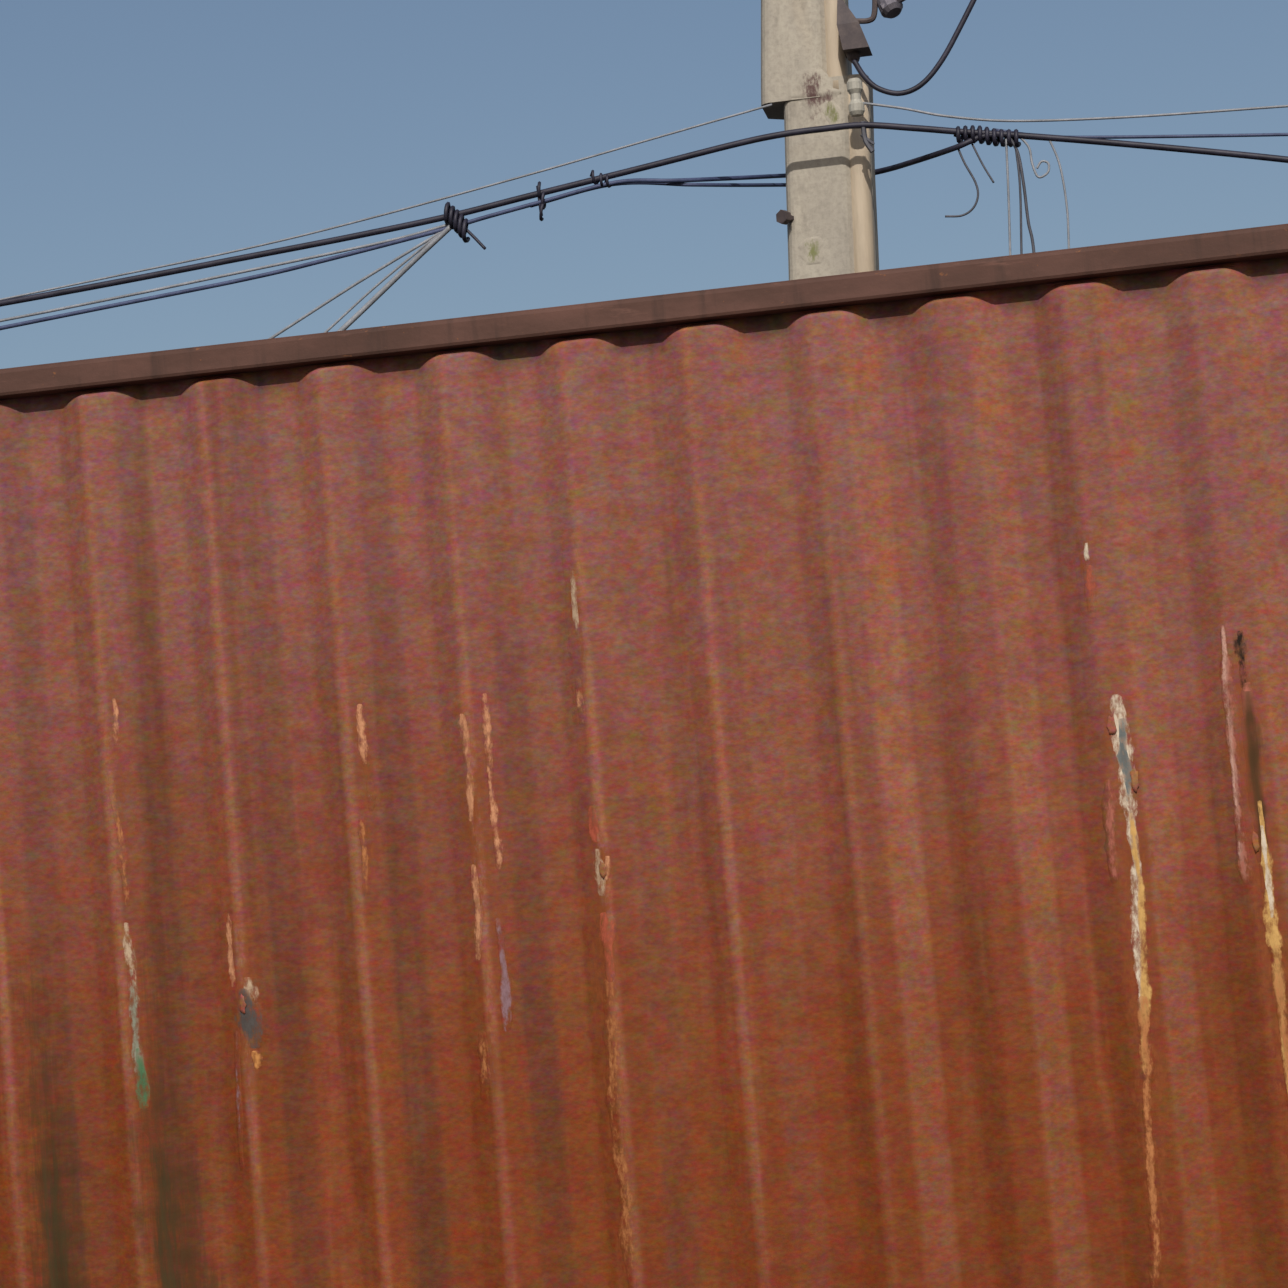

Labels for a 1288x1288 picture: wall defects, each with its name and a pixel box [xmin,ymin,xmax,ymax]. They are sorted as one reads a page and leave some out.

peeling [211,886,282,1171]
corrosion [1090,681,1186,1288]
corrosion [1210,622,1288,1256]